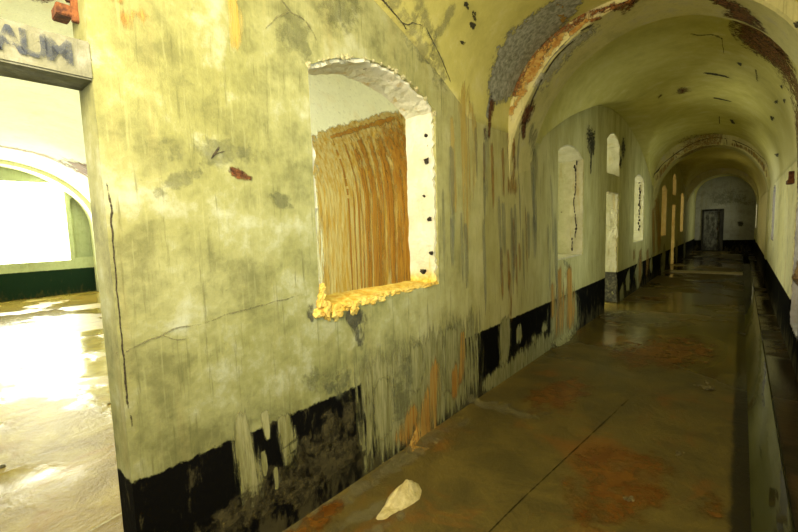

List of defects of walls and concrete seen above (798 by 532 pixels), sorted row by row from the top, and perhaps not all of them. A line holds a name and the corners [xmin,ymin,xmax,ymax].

crack [266,1,311,29]
crack [382,0,451,82]
spalling [486,0,583,118]
spalling [535,26,596,87]
crack [512,0,638,125]
crack [694,0,796,84]
rust [54,158,88,178]
crack [638,97,768,231]
leakage [283,429,448,532]